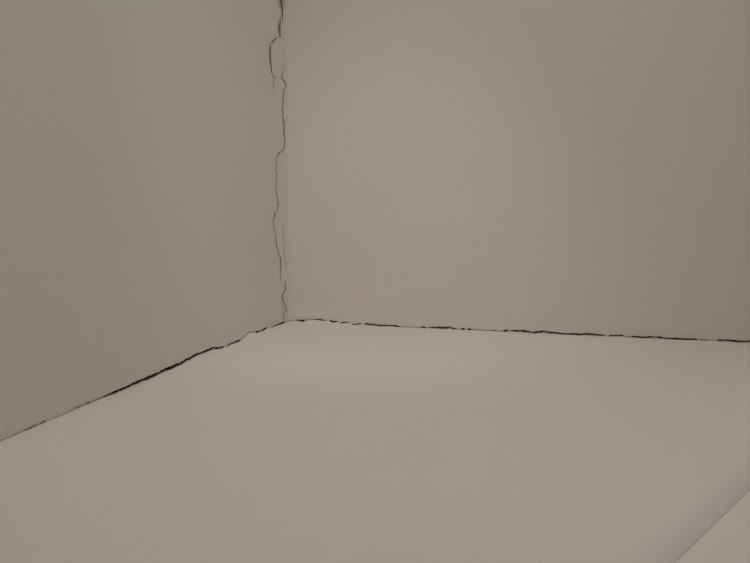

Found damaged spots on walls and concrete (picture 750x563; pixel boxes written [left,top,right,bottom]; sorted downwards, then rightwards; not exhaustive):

crack [0,0,750,441]